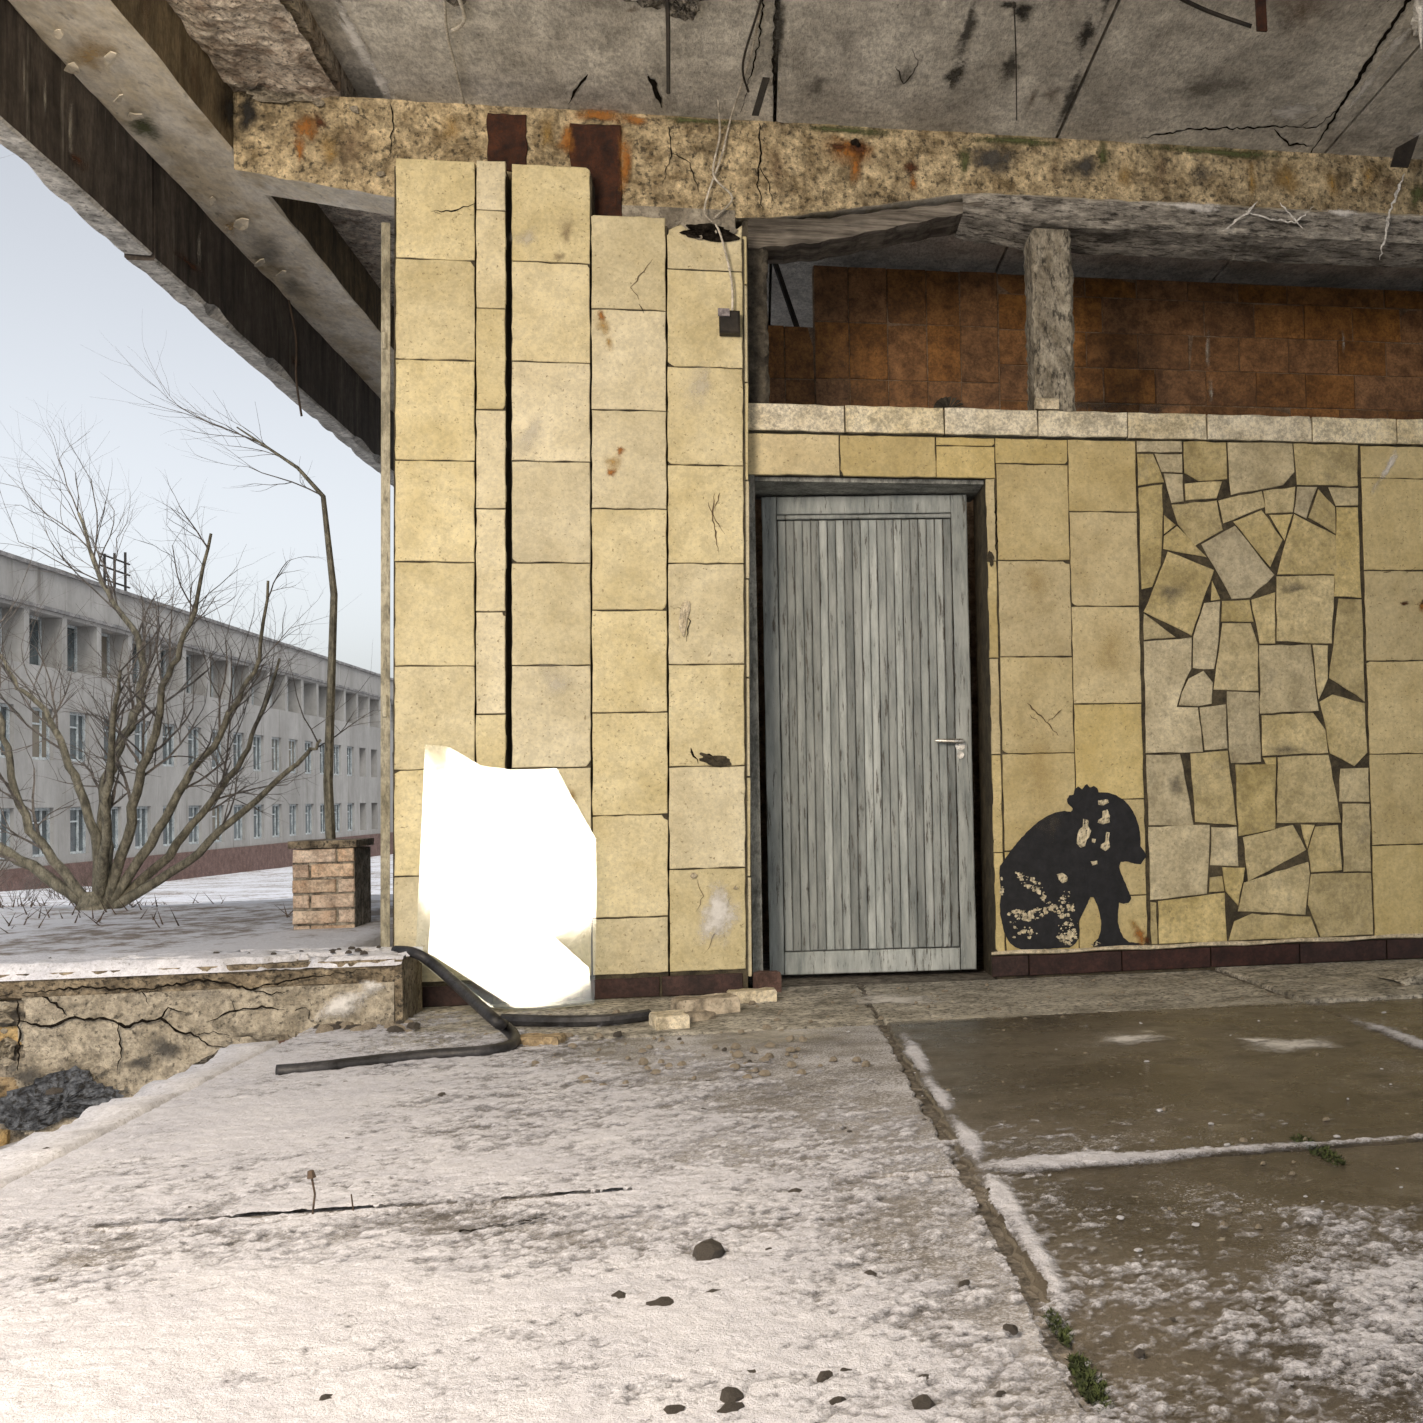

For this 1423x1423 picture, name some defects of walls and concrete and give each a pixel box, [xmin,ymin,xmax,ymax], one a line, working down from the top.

spalling [624,0,704,21]
crack [1143,0,1411,153]
rust [560,109,645,151]
rust [620,142,631,188]
rust [830,138,867,179]
spalling [675,218,740,242]
crack [0,969,365,1071]